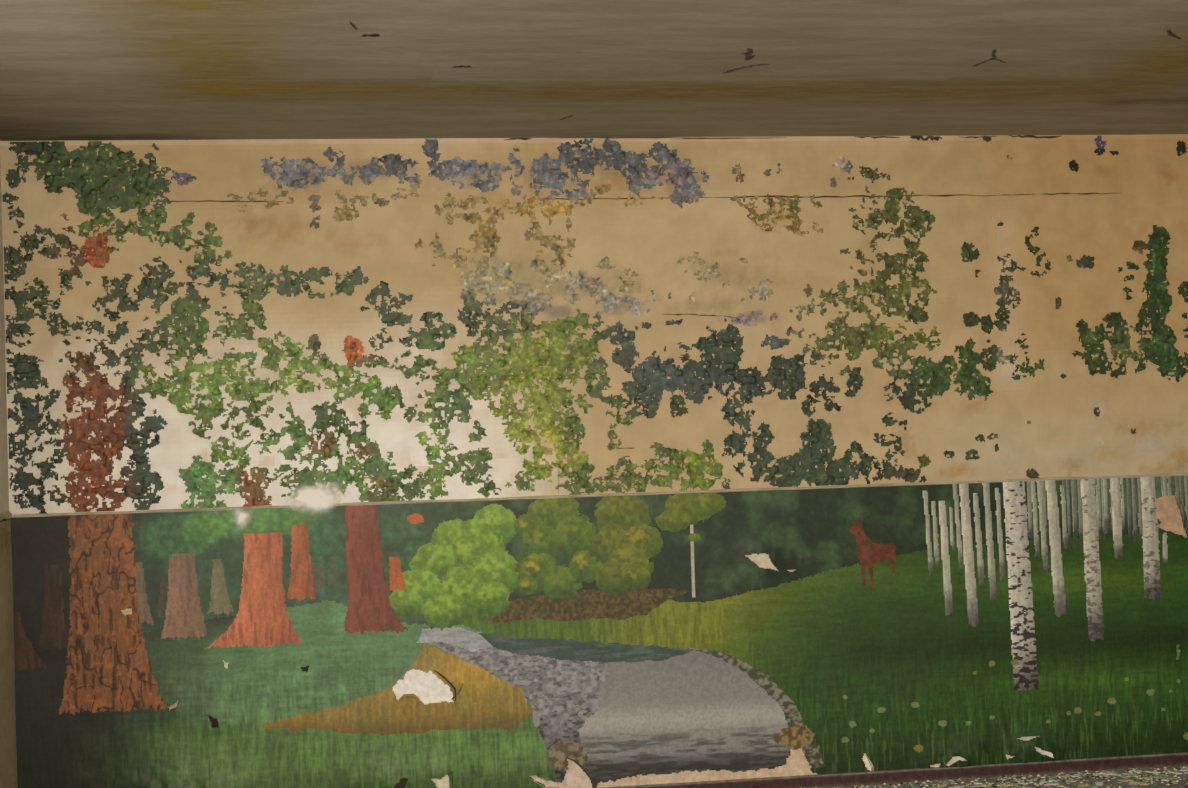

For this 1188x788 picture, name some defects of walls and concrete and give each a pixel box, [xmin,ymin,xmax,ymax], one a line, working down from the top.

peeling [1094,136,1119,155]
peeling [1176,141,1187,156]
peeling [1067,255,1095,269]
peeling [1072,225,1188,382]
peeling [2,138,1052,526]
flaking render [393,669,454,705]
flaking render [529,748,817,788]